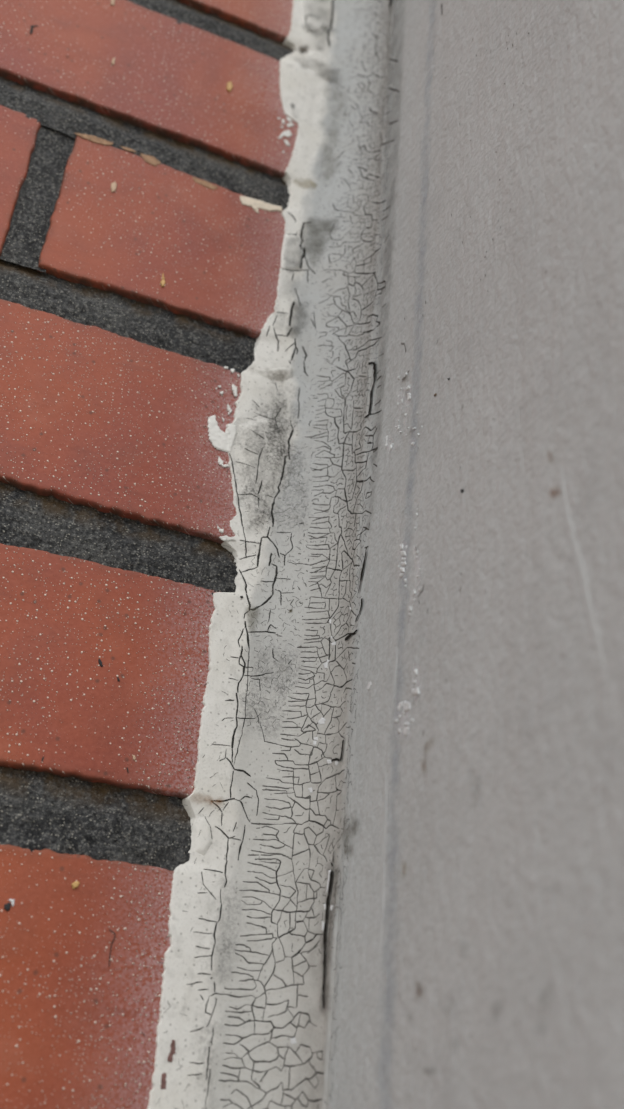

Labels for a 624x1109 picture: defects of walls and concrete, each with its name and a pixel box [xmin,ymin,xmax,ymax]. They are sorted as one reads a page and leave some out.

peeling [208,366,240,468]
crack [142,0,399,1109]